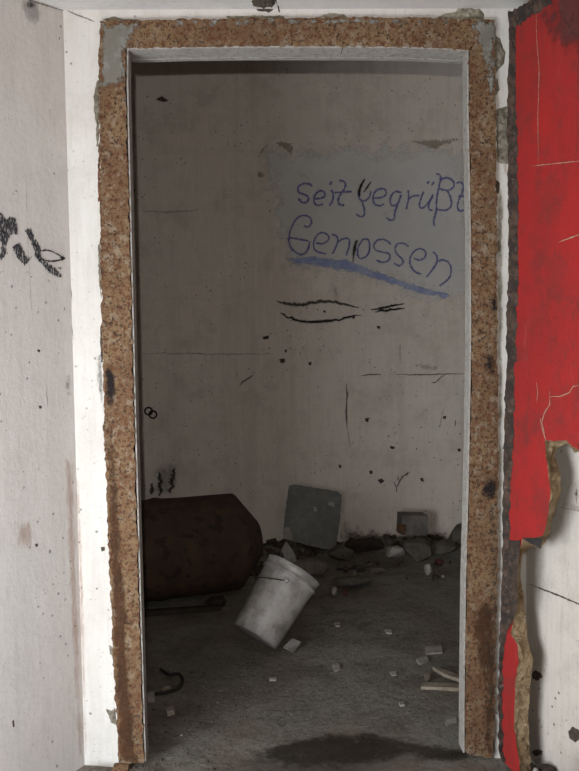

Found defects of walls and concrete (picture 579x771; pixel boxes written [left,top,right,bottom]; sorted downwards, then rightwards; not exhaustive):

flaking render [494,35,505,95]
flaking render [496,106,508,164]
damp [256,733,468,768]
spalling [568,727,579,743]